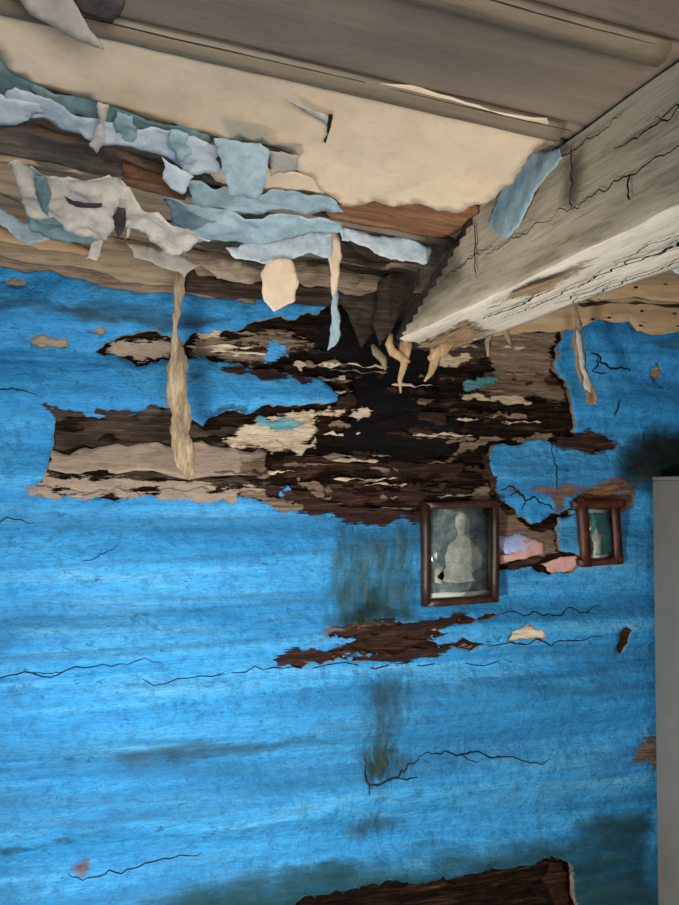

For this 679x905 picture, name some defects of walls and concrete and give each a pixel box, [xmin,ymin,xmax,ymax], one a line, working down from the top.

peeling [0,15,549,213]
crack [561,104,679,164]
crack [439,145,679,279]
spalling [23,293,621,574]
damp [336,530,407,630]
spalling [273,612,497,669]
crack [0,658,434,686]
crack [363,750,550,795]
spalling [296,856,575,905]